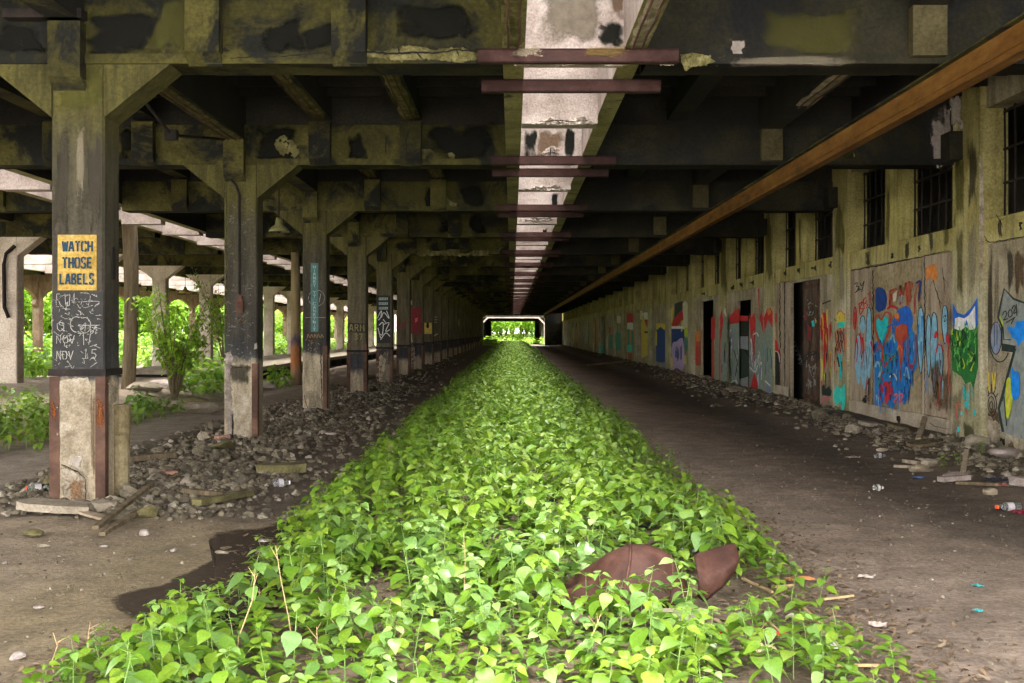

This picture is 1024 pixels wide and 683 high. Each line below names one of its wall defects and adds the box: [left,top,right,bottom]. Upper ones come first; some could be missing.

spalling [366,45,478,63]
spalling [665,53,715,71]
peeling [274,135,299,158]
damp [525,129,575,156]
rust [91,395,103,474]